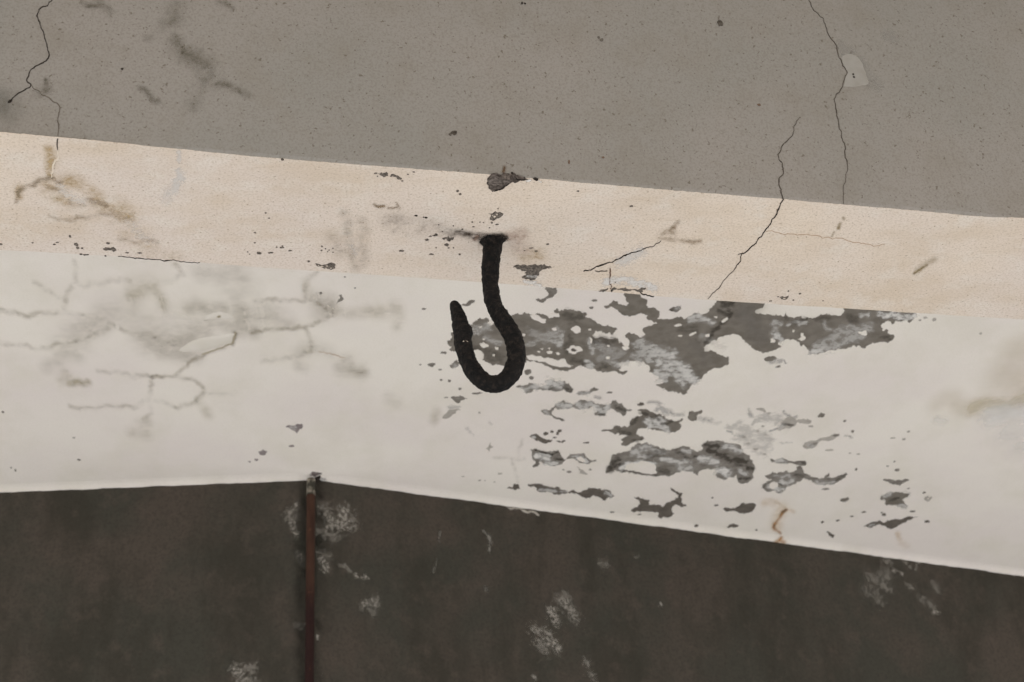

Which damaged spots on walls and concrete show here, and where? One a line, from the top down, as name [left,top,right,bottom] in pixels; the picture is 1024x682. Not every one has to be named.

crack [8,0,61,196]
crack [809,1,848,204]
spalling [487,166,541,192]
crack [708,117,884,299]
crack [584,227,699,291]
peeling [470,318,507,366]
peeling [507,243,936,519]
damp [318,503,355,533]
peeling [711,497,756,528]
peeling [821,461,930,538]
damp [531,596,578,653]